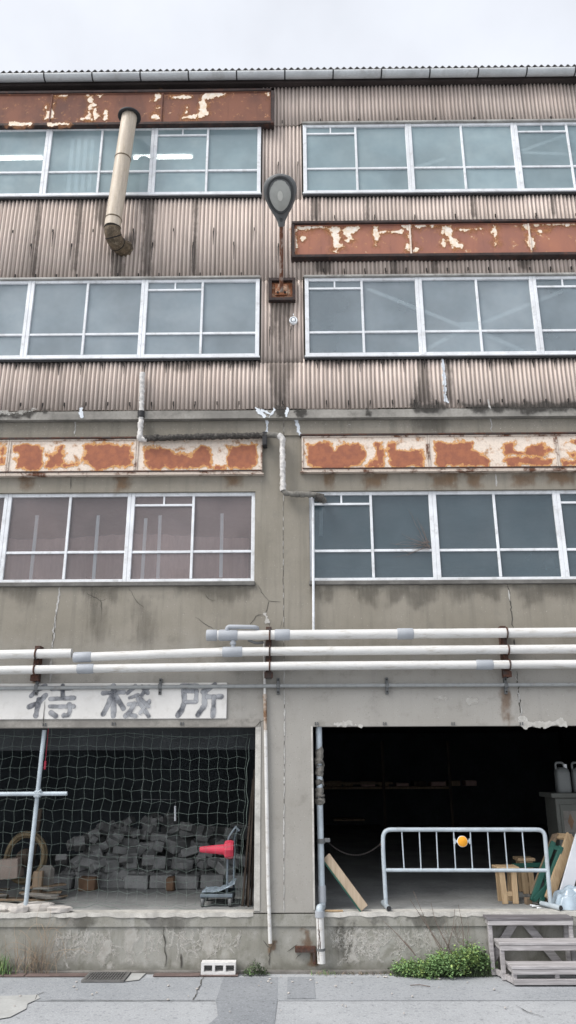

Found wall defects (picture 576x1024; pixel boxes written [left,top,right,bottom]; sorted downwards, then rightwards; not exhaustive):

corrosion [0,441,258,471]
corrosion [305,439,576,468]
crack [250,559,284,628]
spalling [518,716,568,729]
crack [255,671,286,912]
crack [163,930,182,967]